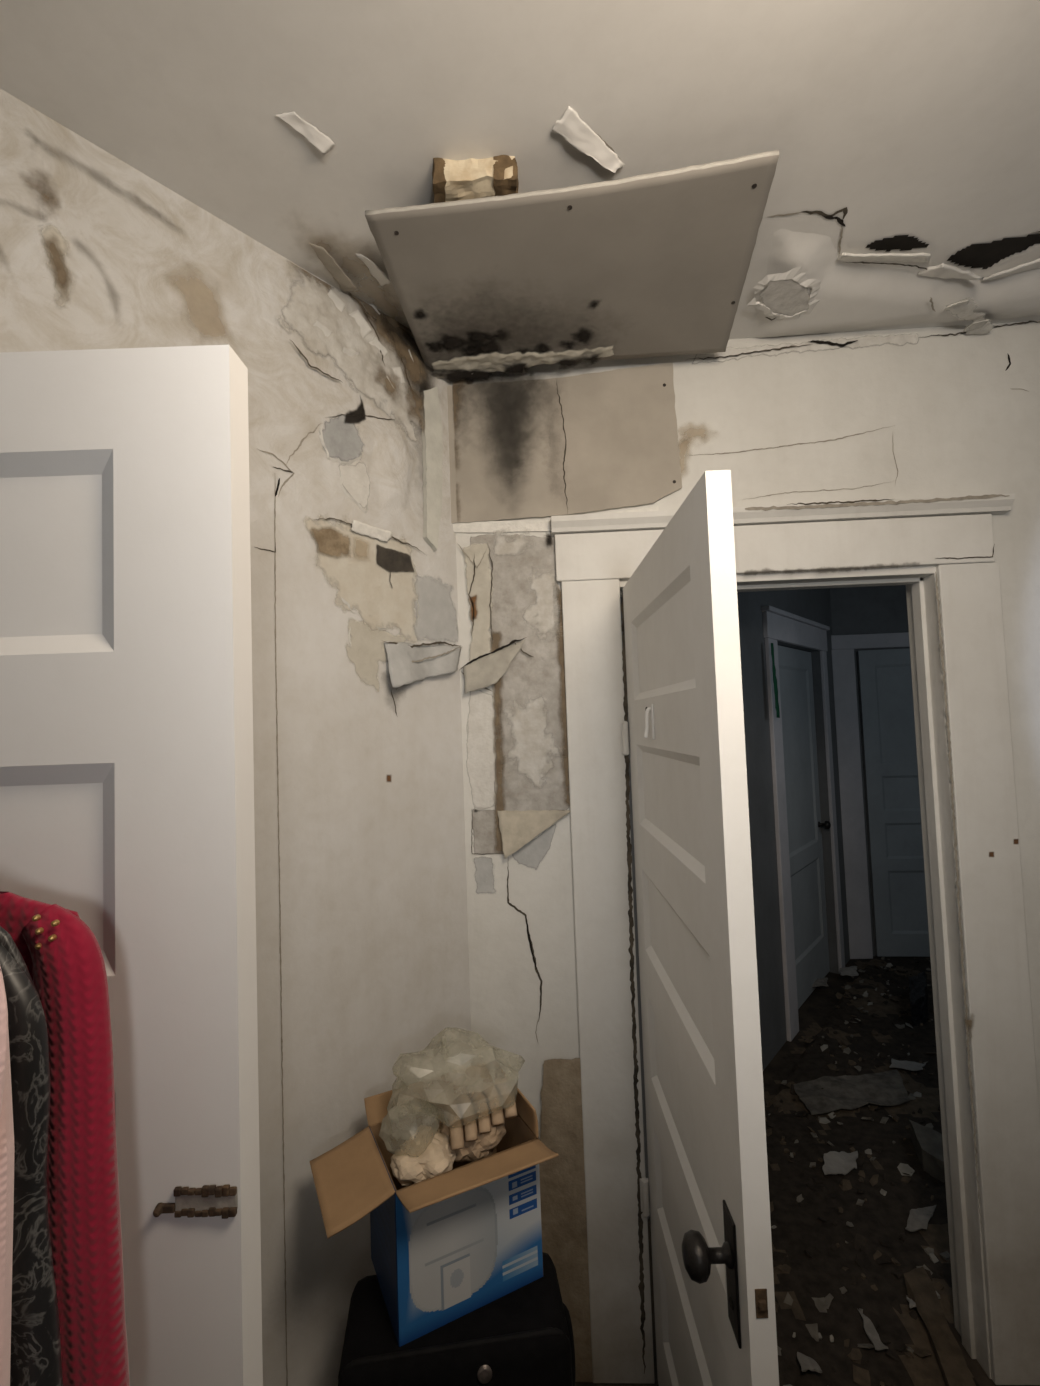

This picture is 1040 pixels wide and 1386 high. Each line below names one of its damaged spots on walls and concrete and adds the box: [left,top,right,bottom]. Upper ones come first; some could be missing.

water stain [318,243,600,431]
peeling [747,266,821,321]
peeling [929,297,994,335]
flaking render [279,243,570,893]
crack [507,867,542,1045]